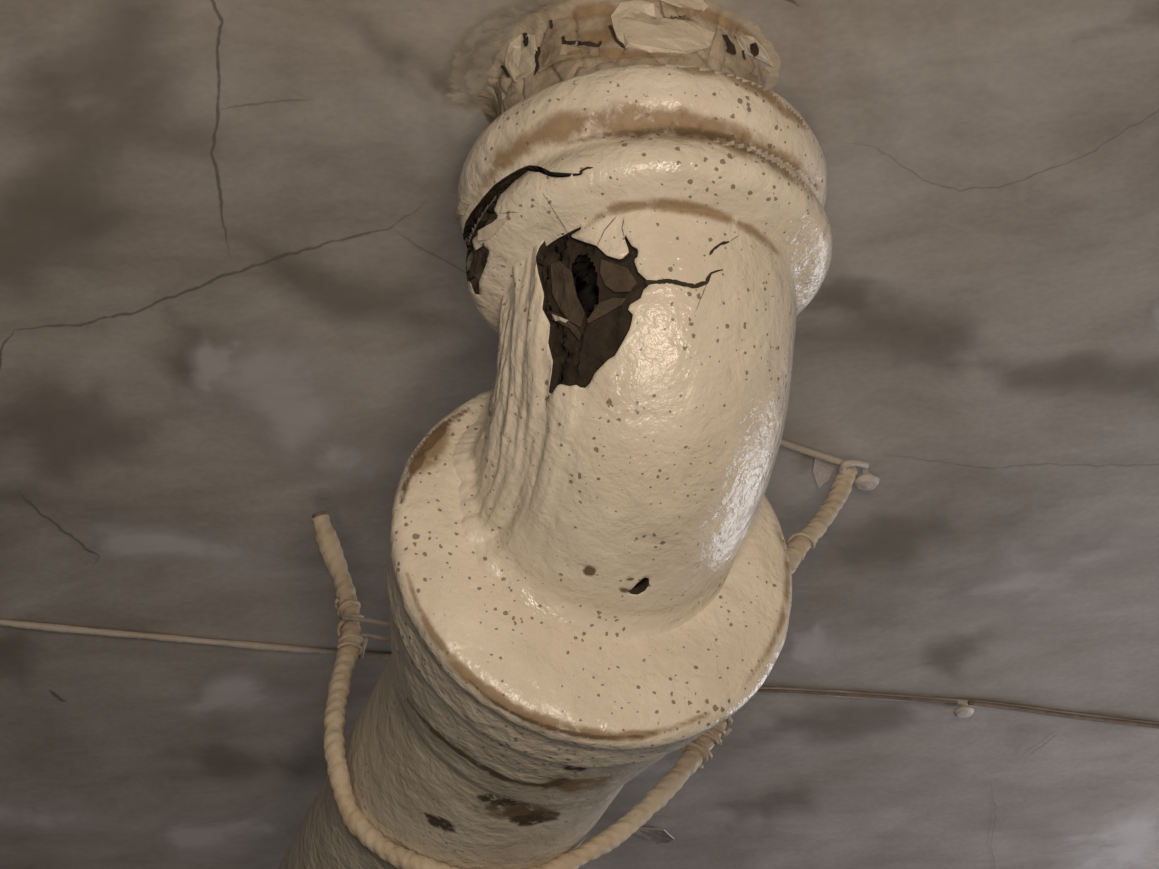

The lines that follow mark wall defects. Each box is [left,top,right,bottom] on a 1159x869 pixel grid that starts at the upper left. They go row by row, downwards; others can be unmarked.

peeling [505,33,599,82]
peeling [611,0,715,54]
peeling [734,33,774,67]
crack [211,0,226,230]
crack [0,228,390,366]
peeling [551,312,581,340]